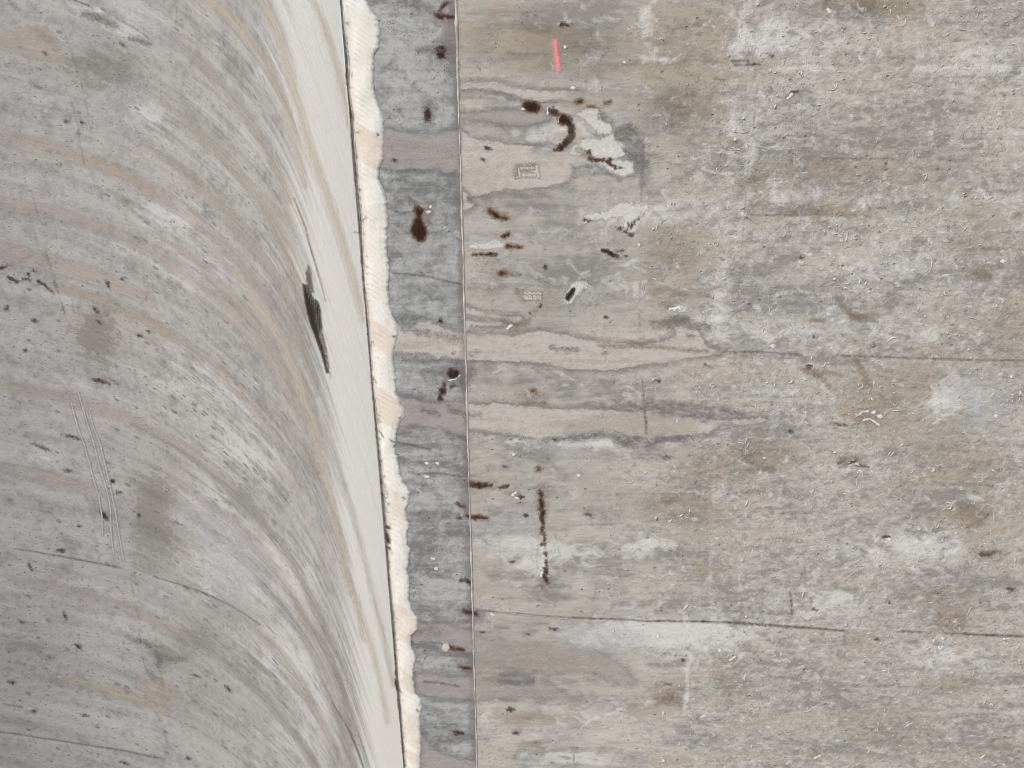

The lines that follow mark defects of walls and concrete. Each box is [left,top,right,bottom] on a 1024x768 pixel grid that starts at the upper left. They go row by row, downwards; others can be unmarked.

rust [435,1,454,20]
rust [435,46,446,59]
rust [521,100,622,170]
rust [410,204,432,242]
rust [472,208,523,257]
spalling [302,266,329,373]
rust [437,367,473,401]
rust [467,481,509,489]
rust [456,502,489,521]
rust [538,490,550,585]